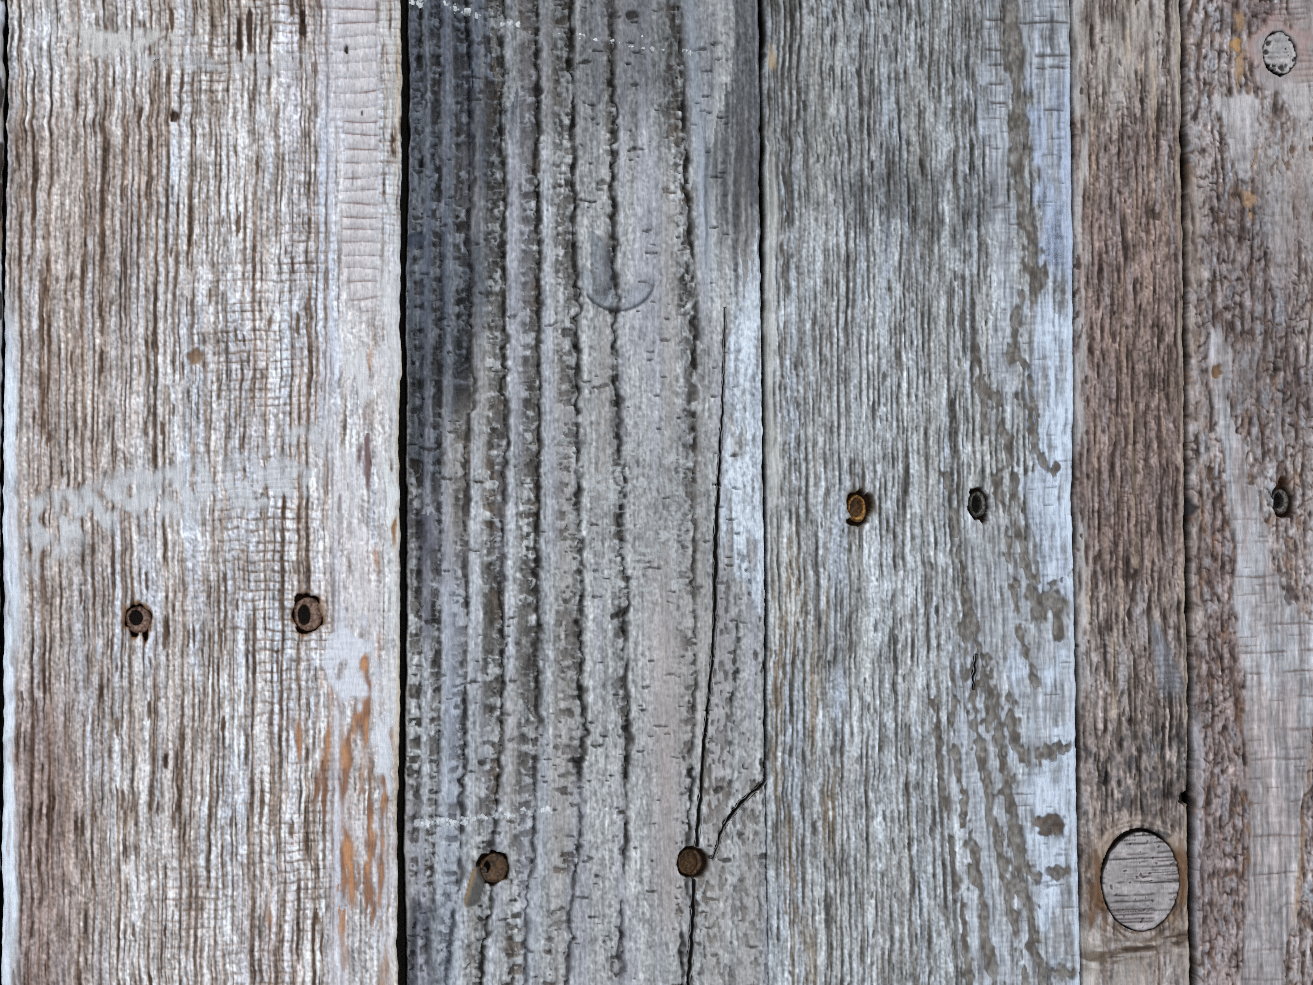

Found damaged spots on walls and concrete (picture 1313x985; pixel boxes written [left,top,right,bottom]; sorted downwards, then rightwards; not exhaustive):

crack [685,308,767,985]
rust [315,653,388,940]
rust [379,955,388,985]